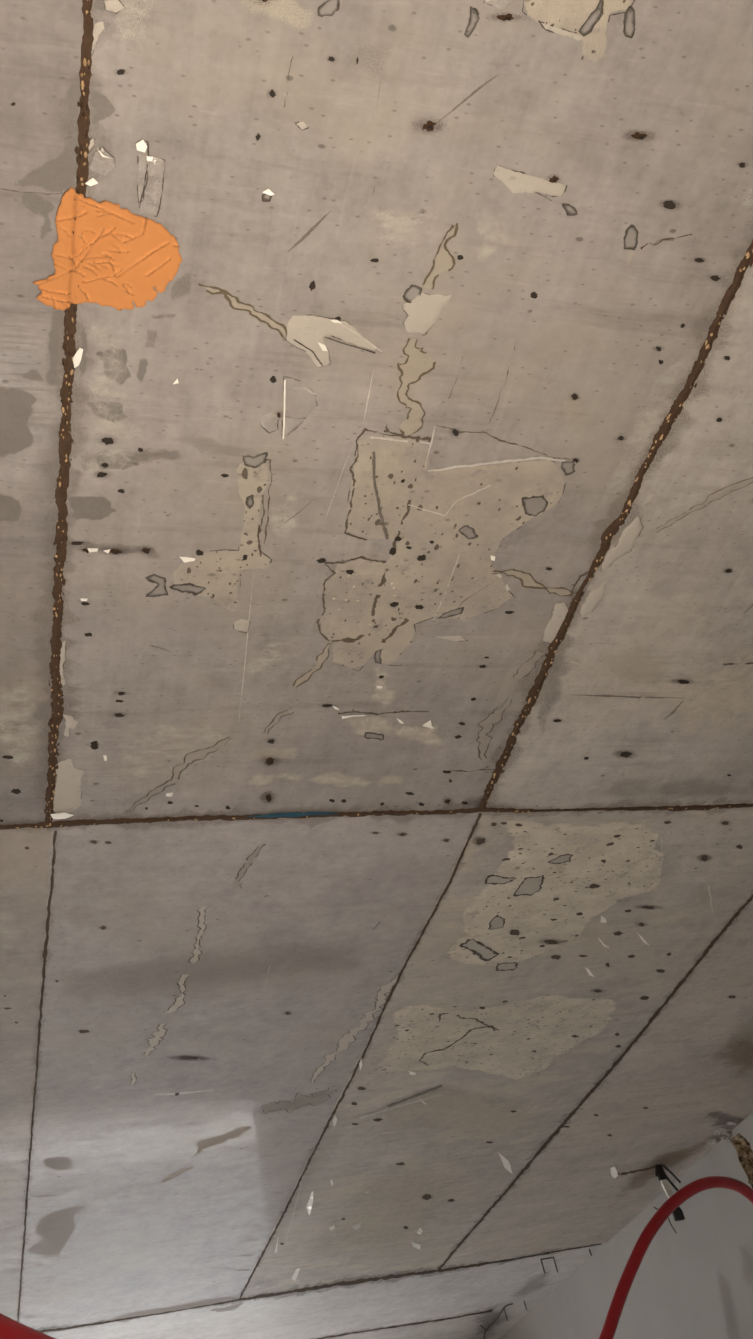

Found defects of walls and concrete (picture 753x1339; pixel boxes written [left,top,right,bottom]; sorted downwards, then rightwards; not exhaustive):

peeling [286,314,381,367]
damp [0,310,64,457]
damp [43,272,269,559]
crack [656,477,753,532]
peeling [145,452,272,633]
spalling [471,822,522,845]
spalling [485,854,573,897]
spalling [460,915,565,971]
spalling [614,905,661,936]